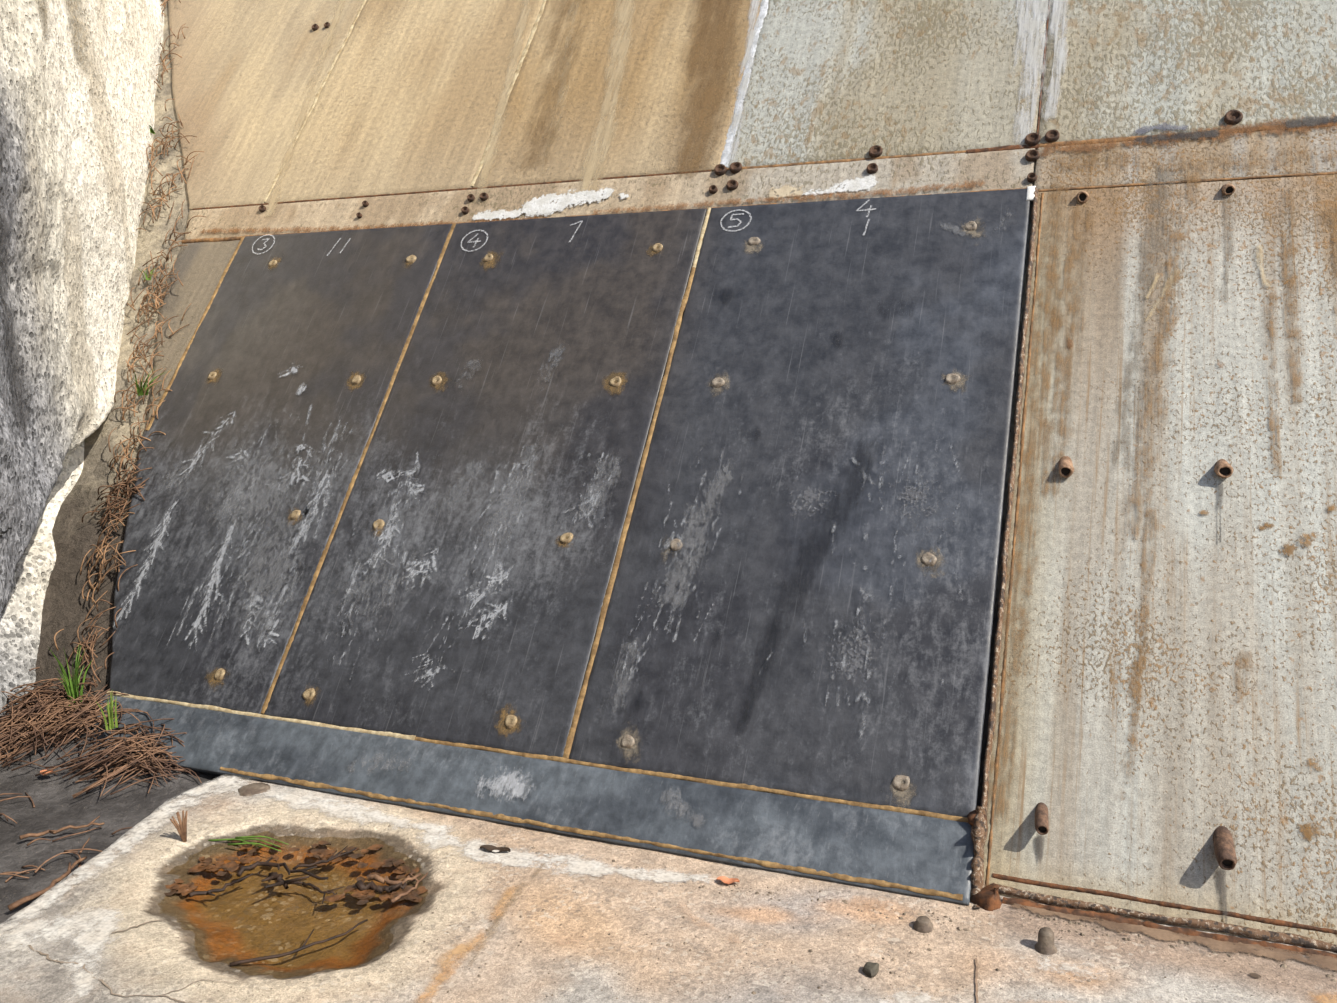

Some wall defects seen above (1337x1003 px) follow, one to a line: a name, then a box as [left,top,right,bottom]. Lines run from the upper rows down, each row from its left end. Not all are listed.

corrosion [1042,115,1337,167]
corrosion [1269,191,1302,474]
corrosion [990,187,1090,814]
corrosion [1130,225,1189,745]
corrosion [1282,532,1316,556]
corrosion [1299,823,1321,840]
damp [0,775,710,1000]
crack [20,944,230,1003]
damp [879,991,934,1003]